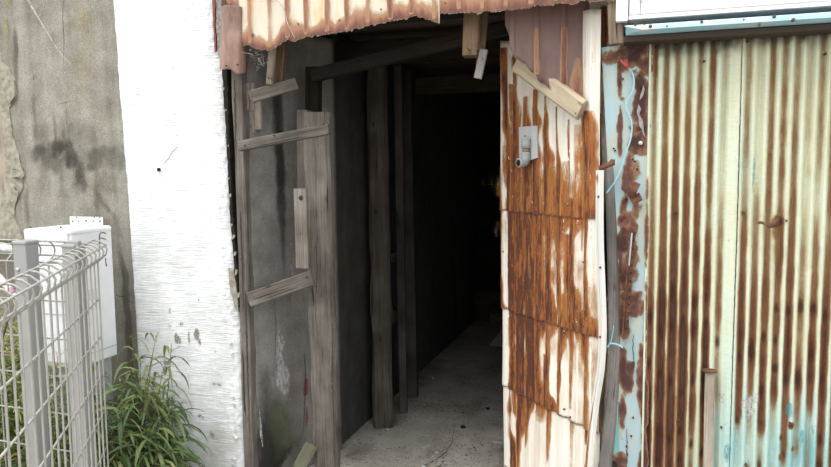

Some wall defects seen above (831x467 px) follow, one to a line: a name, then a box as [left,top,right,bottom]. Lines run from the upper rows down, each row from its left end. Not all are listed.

rust [226,0,722,467]
rust [735,38,831,467]